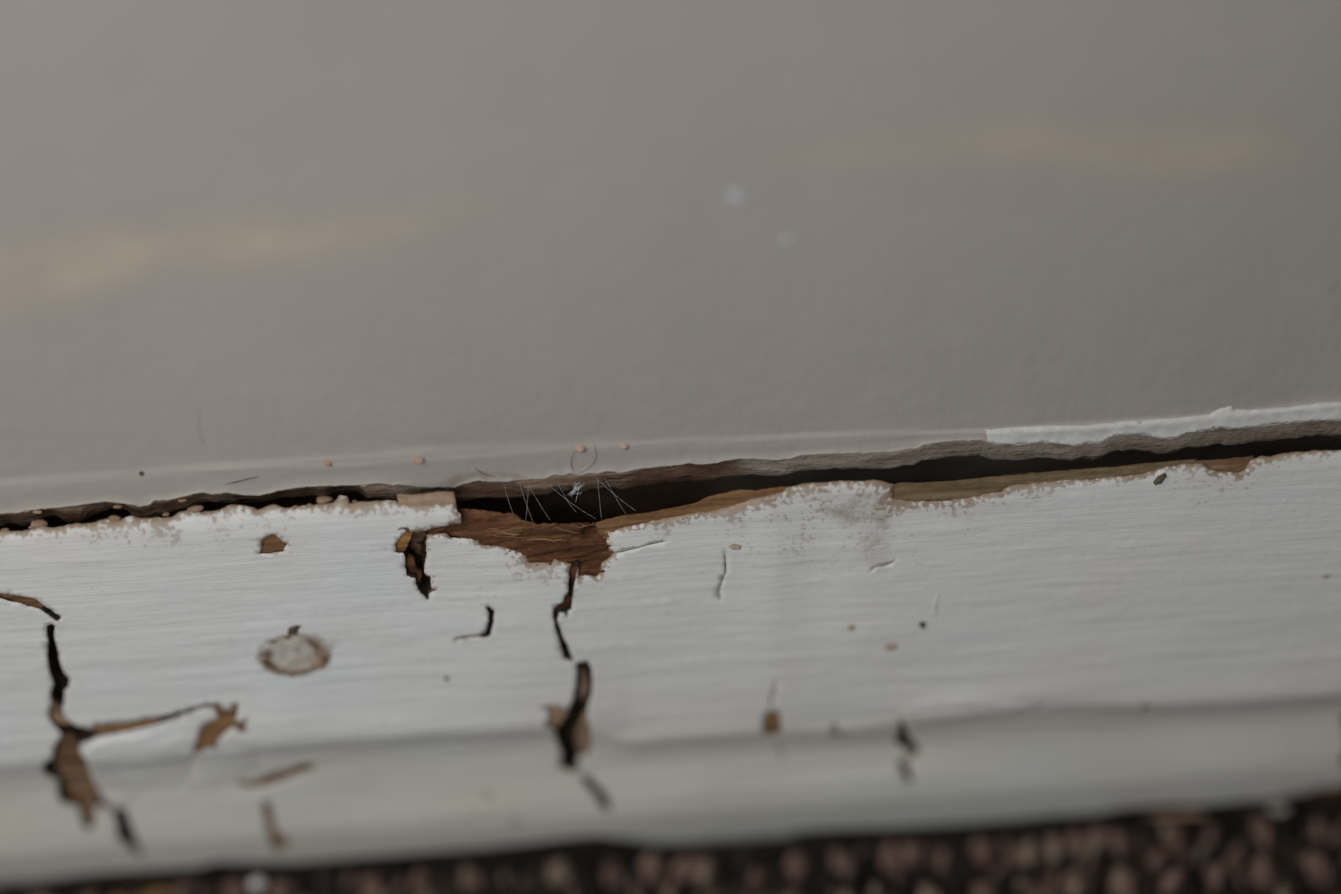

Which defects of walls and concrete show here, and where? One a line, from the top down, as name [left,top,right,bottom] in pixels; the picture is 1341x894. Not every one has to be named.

peeling [397,491,457,509]
crack [0,421,1341,599]
peeling [596,486,786,539]
crack [455,607,494,639]
crack [545,561,610,810]
crack [0,593,207,853]
crack [897,718,920,782]